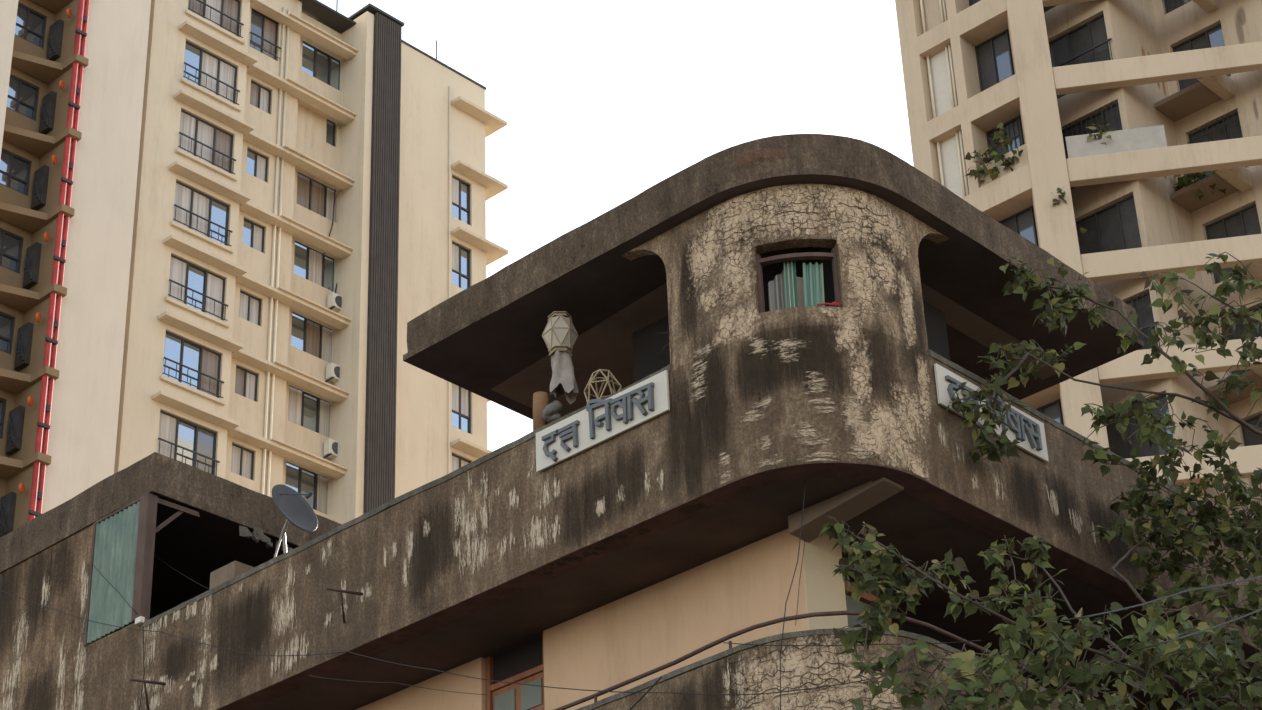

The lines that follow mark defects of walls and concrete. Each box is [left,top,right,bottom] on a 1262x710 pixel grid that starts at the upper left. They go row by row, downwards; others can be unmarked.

leakage [681,242,700,334]
crack [656,196,902,417]
leakage [865,222,926,373]
leakage [670,321,844,491]
leakage [863,330,893,398]
peeling [0,611,29,710]
leakage [0,539,71,641]
peeling [56,561,88,710]
peeling [383,520,431,589]
peeling [450,450,561,581]
peeling [595,484,623,517]
crack [719,636,950,710]